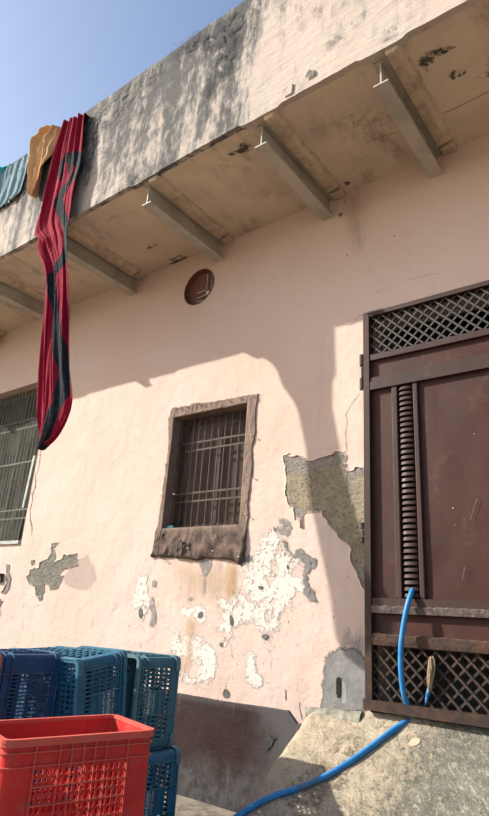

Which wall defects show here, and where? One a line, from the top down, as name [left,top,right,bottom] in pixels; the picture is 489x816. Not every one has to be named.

damp [176,12,243,98]
peeling [0,564,11,616]
flaking render [26,542,79,601]
flaking render [170,449,365,688]